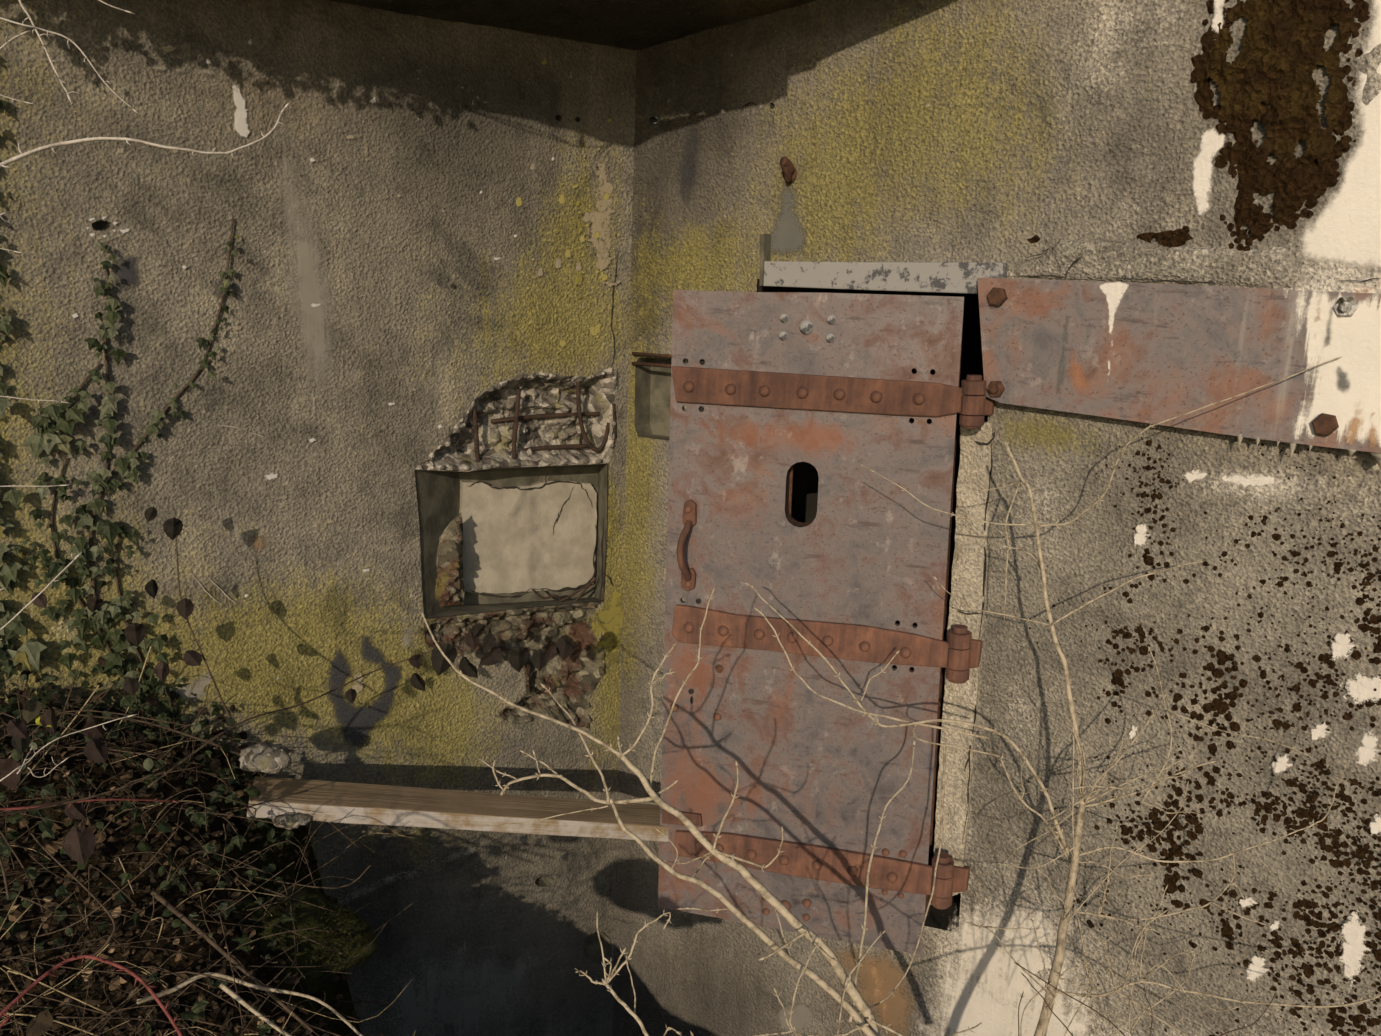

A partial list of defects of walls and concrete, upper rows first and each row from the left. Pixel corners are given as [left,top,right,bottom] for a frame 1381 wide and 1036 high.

spalling [415,367,617,472]
water stain [178,675,211,701]